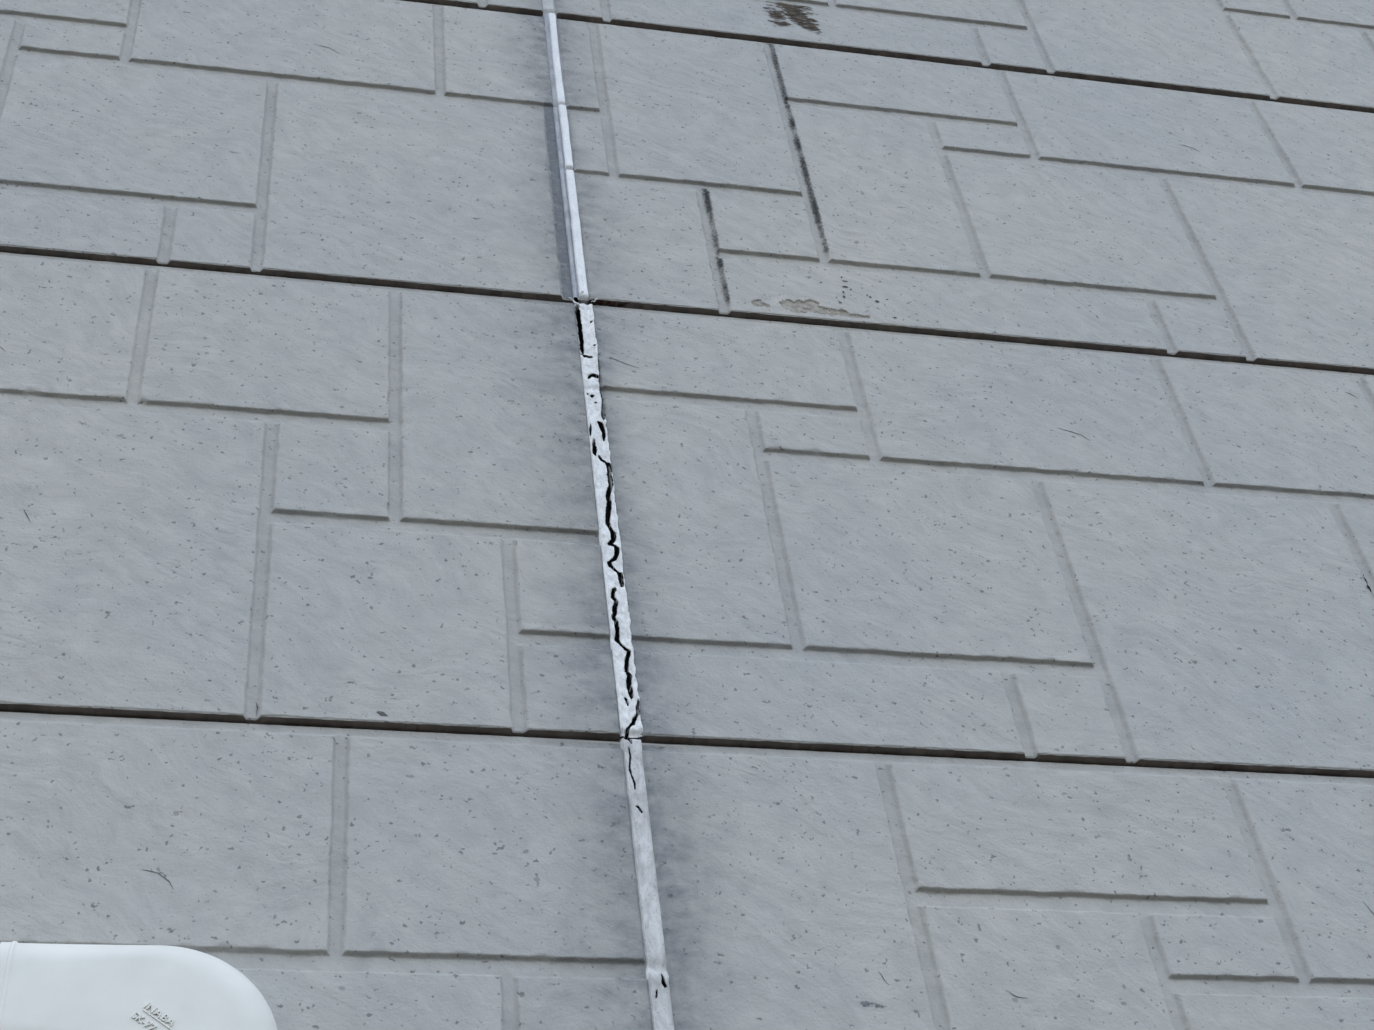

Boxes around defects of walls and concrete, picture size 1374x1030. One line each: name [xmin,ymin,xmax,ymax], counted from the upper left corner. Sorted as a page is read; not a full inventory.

spalling [752,299,870,319]
crack [589,421,643,813]